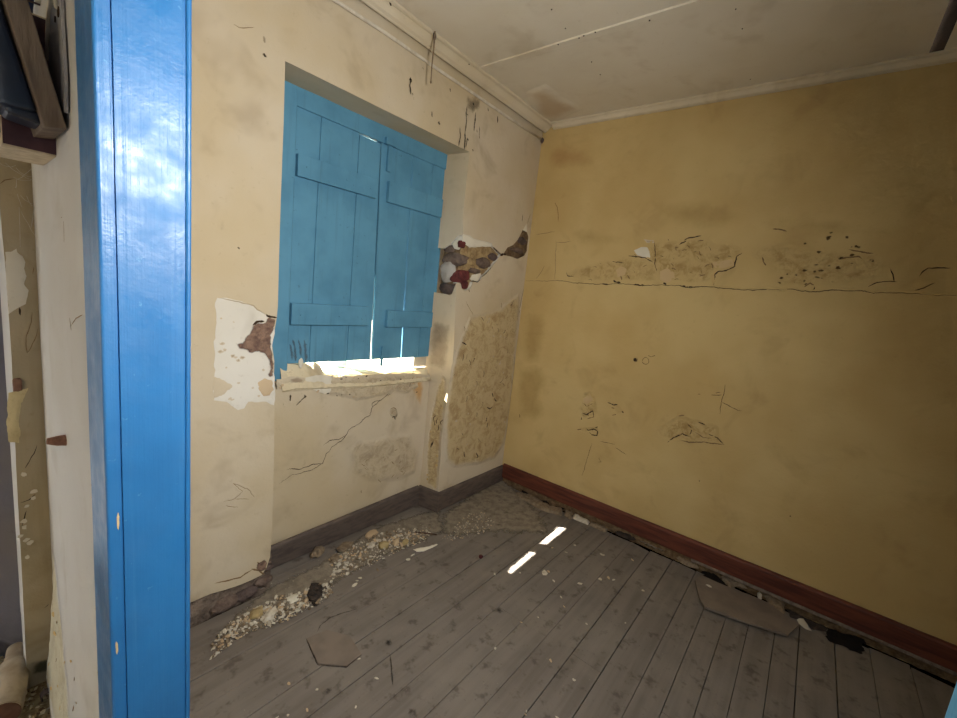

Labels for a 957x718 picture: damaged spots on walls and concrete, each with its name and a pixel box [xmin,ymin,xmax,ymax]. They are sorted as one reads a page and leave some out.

peeling [5,249,29,315]
spalling [439,214,531,295]
peeling [565,235,743,288]
crack [510,203,957,343]
peeling [213,298,423,410]
crack [279,389,397,485]